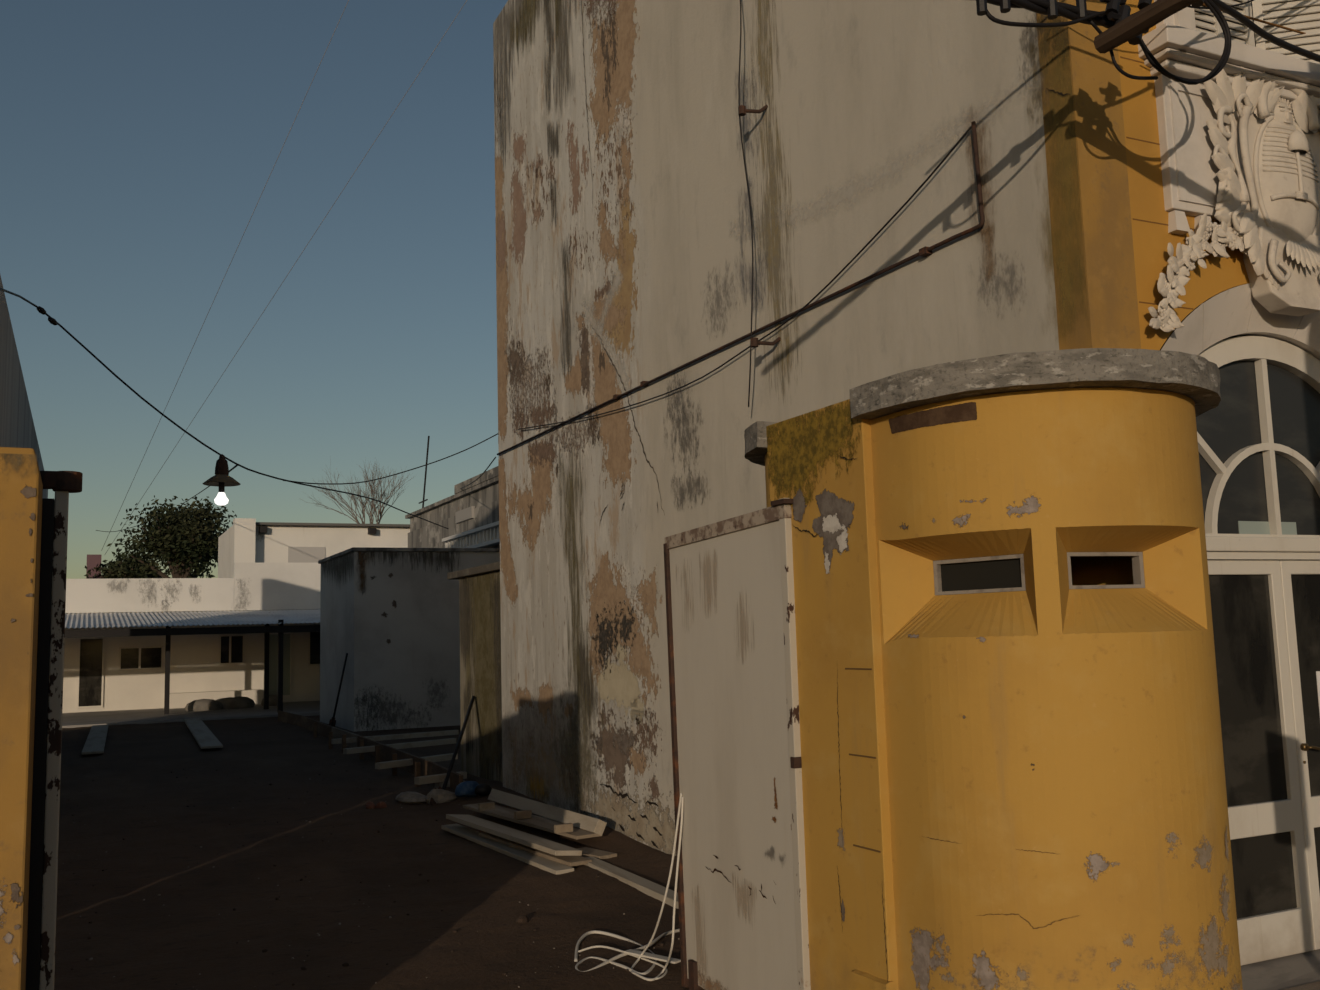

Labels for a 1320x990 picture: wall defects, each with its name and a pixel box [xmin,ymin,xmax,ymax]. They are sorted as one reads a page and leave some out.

water stain [493,0,576,164]
water stain [1023,14,1083,319]
water stain [560,243,573,374]
peeling [495,0,640,609]
water stain [322,552,354,587]
flaking render [793,488,854,574]
water stain [492,582,502,767]
water stain [556,601,639,815]
peeling [586,551,662,802]
peeling [909,927,957,990]
peeling [972,950,1029,990]
peeling [1147,827,1241,990]